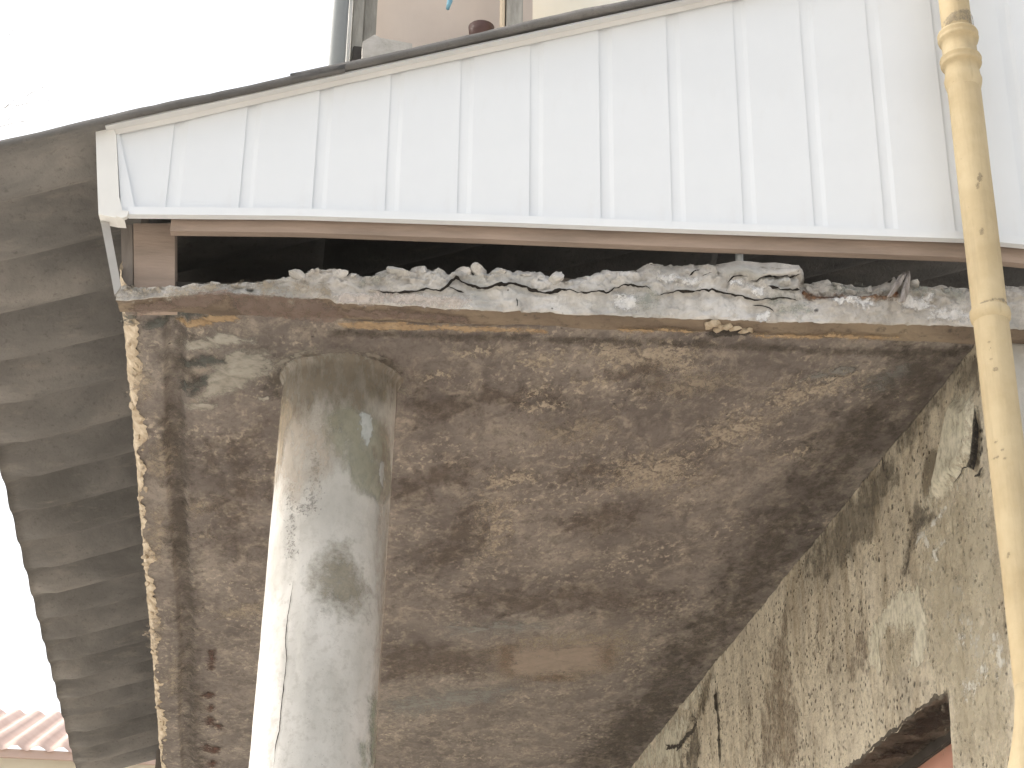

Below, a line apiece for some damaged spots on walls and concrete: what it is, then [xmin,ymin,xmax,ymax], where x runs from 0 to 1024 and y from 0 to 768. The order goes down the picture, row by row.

spalling [266,269,357,283]
spalling [375,262,507,278]
crack [376,270,801,311]
peeling [717,261,898,311]
leakage [165,333,226,397]
leakage [275,352,403,490]
crack [953,405,983,484]
spalling [122,312,185,768]
leakage [581,345,979,768]
leakage [902,449,1010,768]
crack [274,588,293,761]
crack [666,689,720,768]